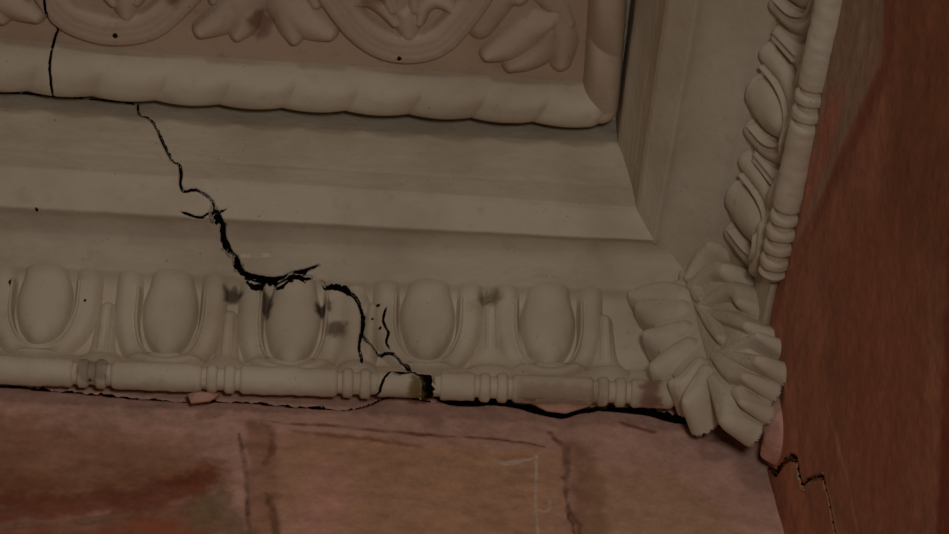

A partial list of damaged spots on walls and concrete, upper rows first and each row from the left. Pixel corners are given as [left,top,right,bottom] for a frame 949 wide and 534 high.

crack [0,0,687,424]
crack [766,454,836,533]